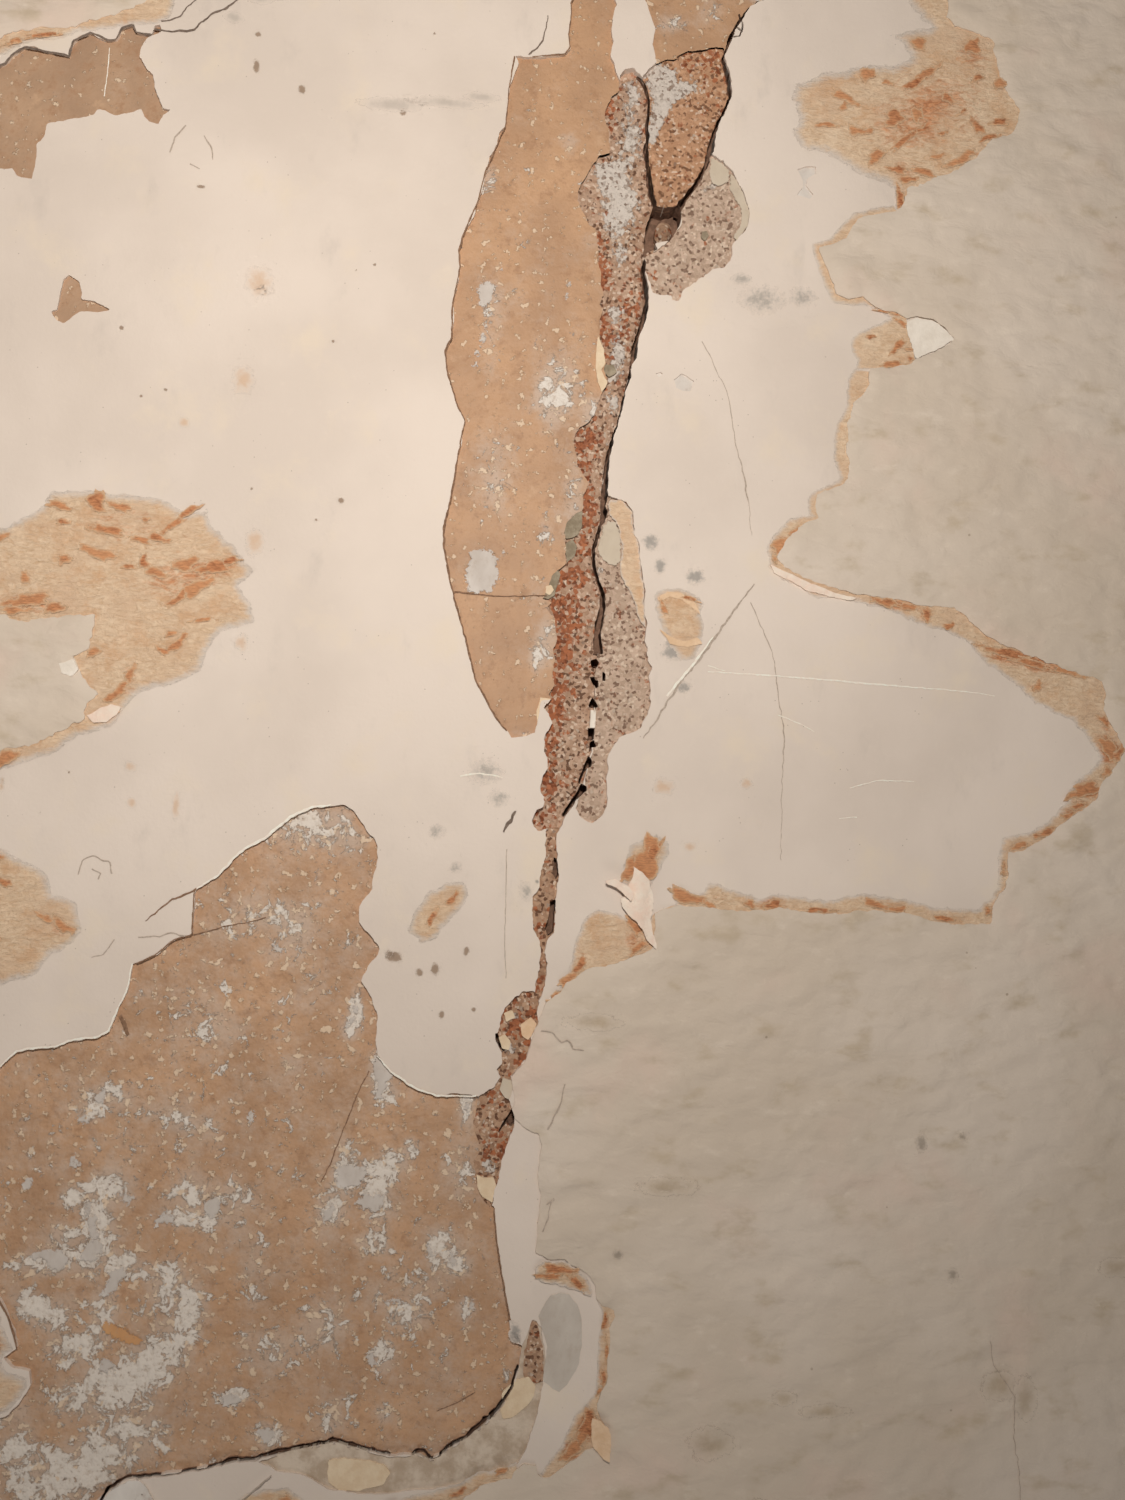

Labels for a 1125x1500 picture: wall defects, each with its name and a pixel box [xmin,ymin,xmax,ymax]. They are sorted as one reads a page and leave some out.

crack [529,15,548,55]
crack [562,1,759,815]
peeling [0,0,762,1500]
crack [643,584,785,859]
crack [545,858,558,935]
crack [498,1030,584,1132]